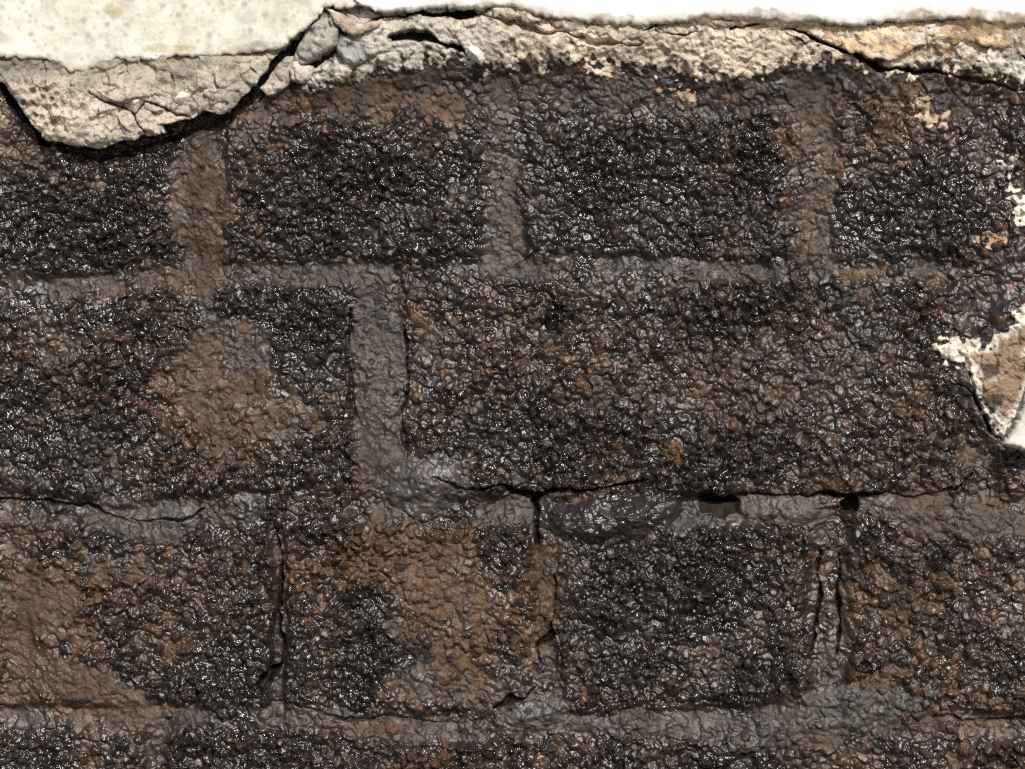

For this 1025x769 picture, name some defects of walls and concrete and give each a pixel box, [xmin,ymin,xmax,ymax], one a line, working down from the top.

spalling [0,5,1025,155]
crack [729,23,946,75]
crack [0,84,51,147]
crack [89,92,191,137]
spalling [996,155,1025,239]
spalling [972,231,1008,250]
spalling [931,304,1025,451]
crack [467,479,646,544]
crack [800,489,884,497]
crack [253,530,286,687]
crack [536,622,555,660]
crack [811,553,841,652]